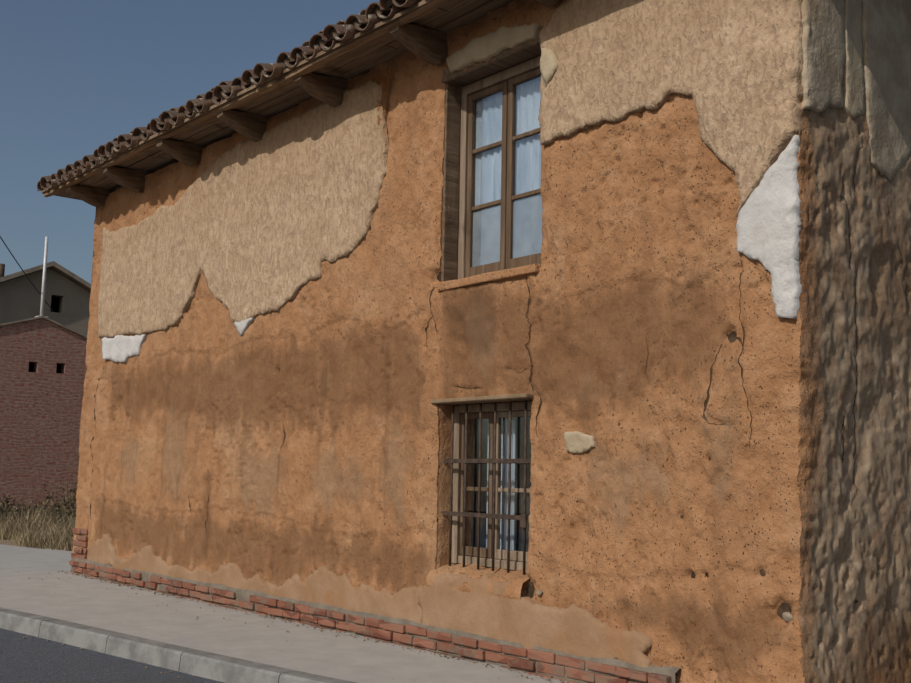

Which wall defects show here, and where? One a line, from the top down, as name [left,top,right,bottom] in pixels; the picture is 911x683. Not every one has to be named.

flaking render [446,0,911,319]
crack [515,277,542,437]
crack [702,259,752,447]
crack [842,130,863,488]
flaking render [87,533,652,667]